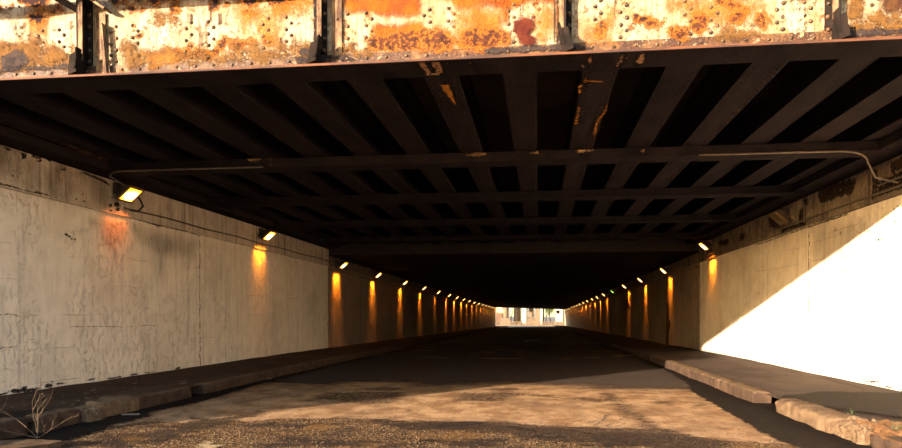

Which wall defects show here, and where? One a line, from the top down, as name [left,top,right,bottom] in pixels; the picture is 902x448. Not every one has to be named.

corrosion [0,4,75,74]
corrosion [119,0,313,72]
corrosion [342,0,423,59]
corrosion [446,0,556,48]
corrosion [668,0,763,43]
corrosion [845,0,902,31]
crack [0,165,116,213]
crack [139,220,201,366]
crack [756,213,872,340]